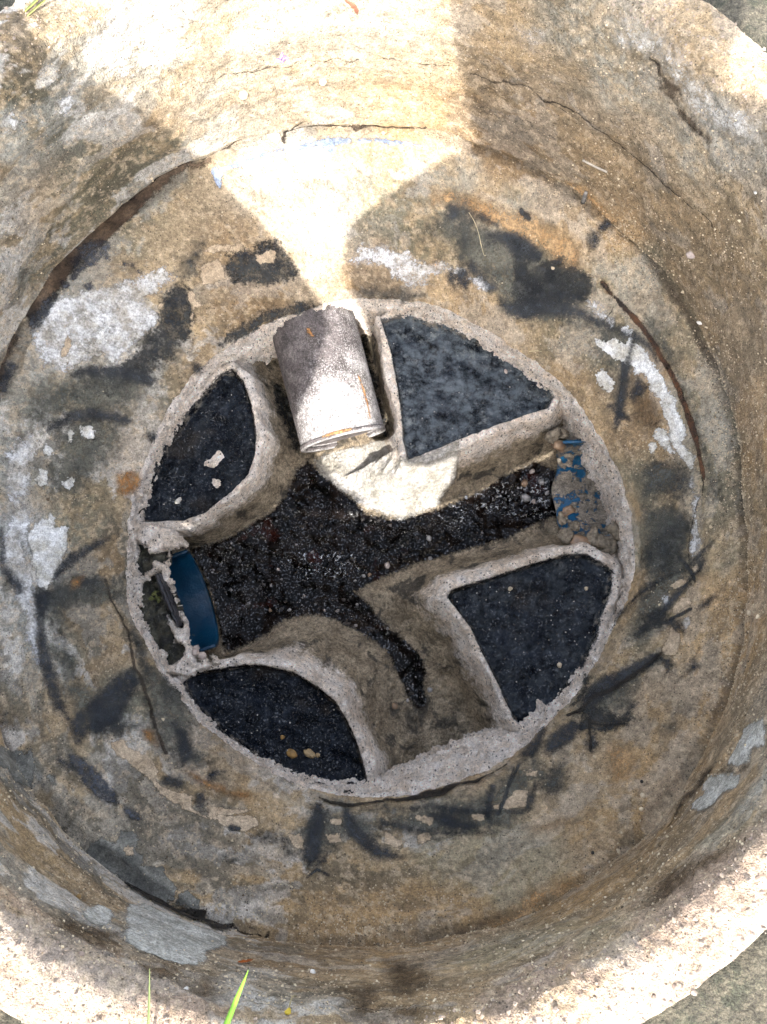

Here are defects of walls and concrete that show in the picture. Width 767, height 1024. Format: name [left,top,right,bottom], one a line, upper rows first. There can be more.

crack [281,122,427,144]
crack [471,73,713,231]
crack [445,204,498,226]
leakage [218,301,322,348]
leakage [349,201,678,429]
leakage [614,461,715,639]
crack [125,882,269,938]